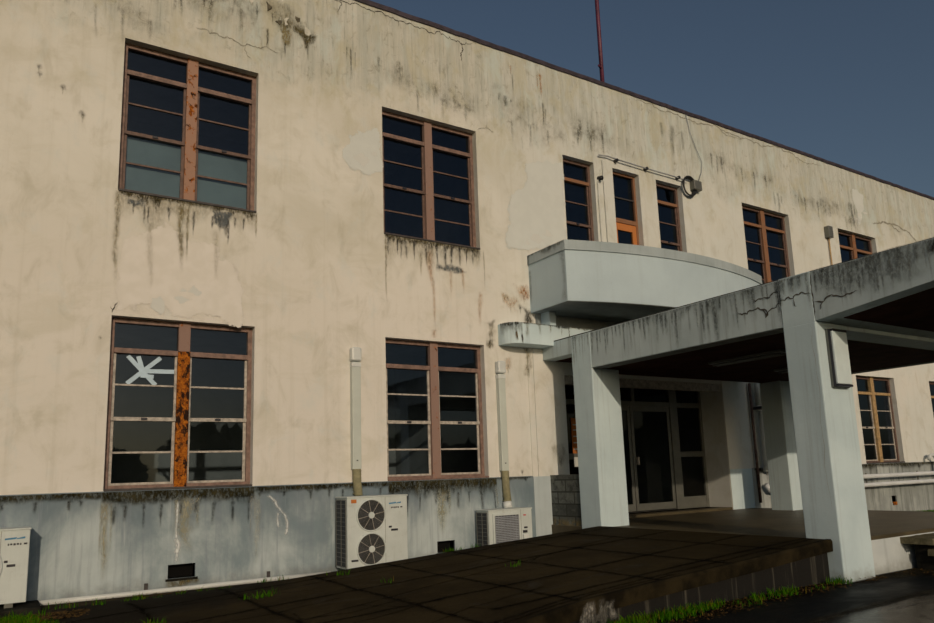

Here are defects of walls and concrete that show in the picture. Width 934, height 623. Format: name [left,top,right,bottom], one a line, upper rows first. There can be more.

crack [198,28,277,58]
spalling [266,1,315,48]
water stain [117,191,257,251]
crack [873,221,917,242]
crack [738,275,856,390]